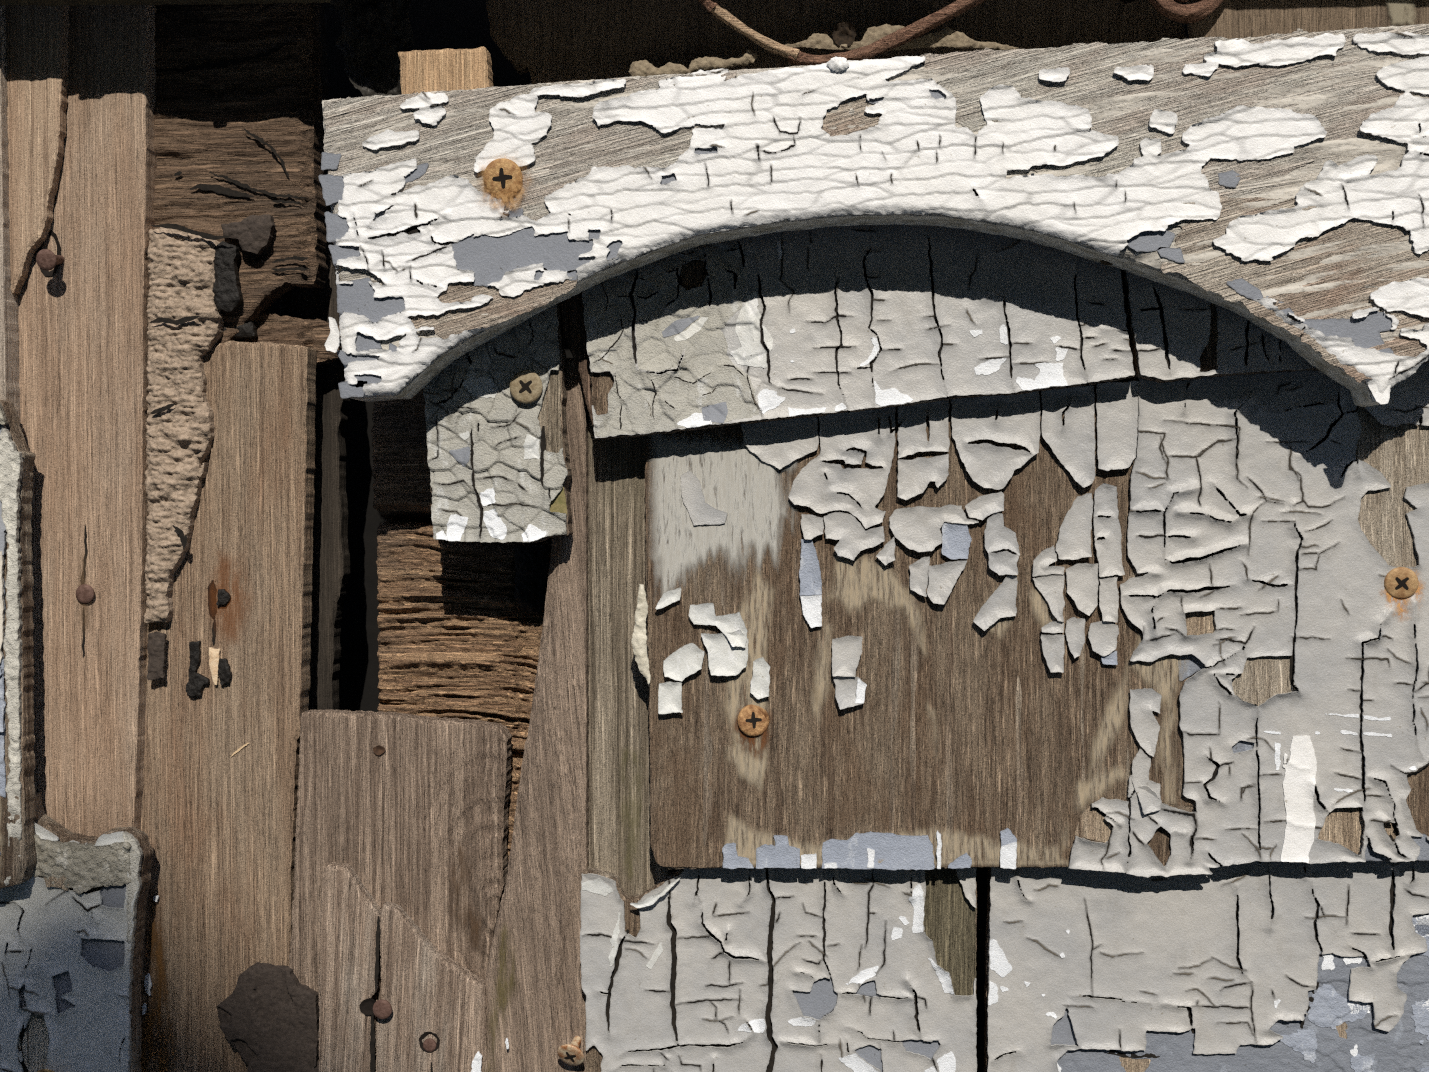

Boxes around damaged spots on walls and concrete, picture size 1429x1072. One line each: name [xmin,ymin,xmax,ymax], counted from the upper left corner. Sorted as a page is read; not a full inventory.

peeling [318,71,737,265]
peeling [821,94,884,136]
peeling [920,24,1429,383]
peeling [0,428,23,886]
peeling [325,317,397,399]
crack [427,323,552,543]
peeling [408,268,578,339]
peeling [623,381,1196,996]
crack [587,91,1429,1072]
peeling [1355,406,1429,567]
peeling [1318,807,1364,855]
peeling [1406,765,1429,837]